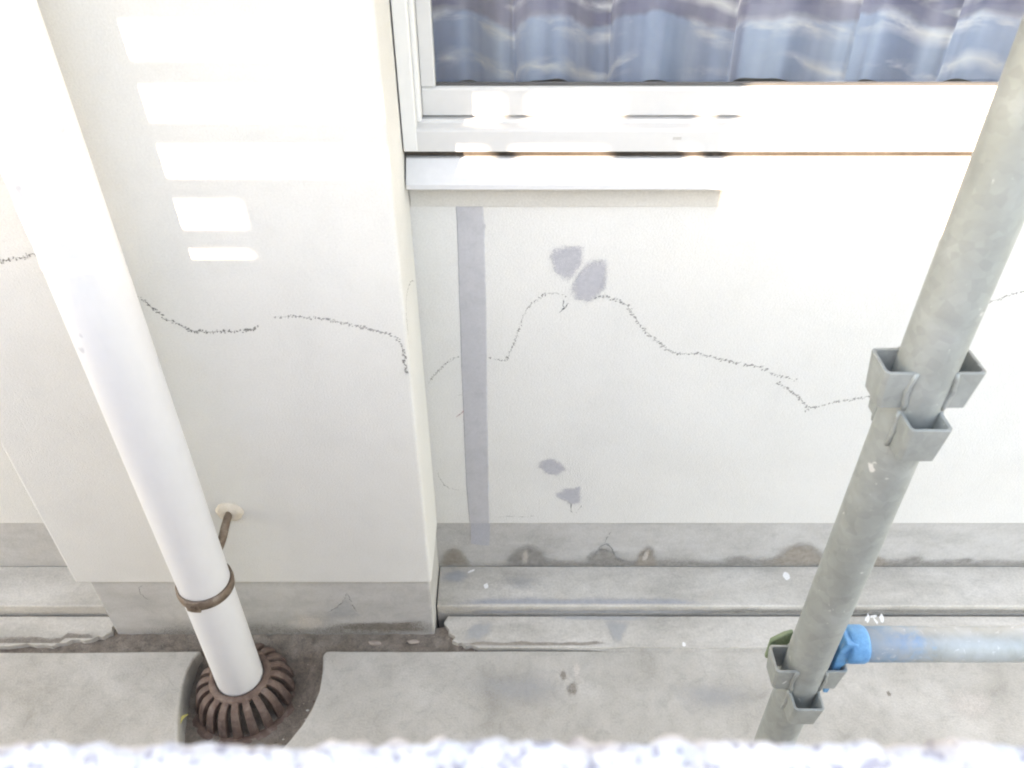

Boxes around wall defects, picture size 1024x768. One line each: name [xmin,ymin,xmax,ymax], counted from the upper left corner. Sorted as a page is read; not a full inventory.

crack [143,280,459,380]
crack [595,295,868,413]